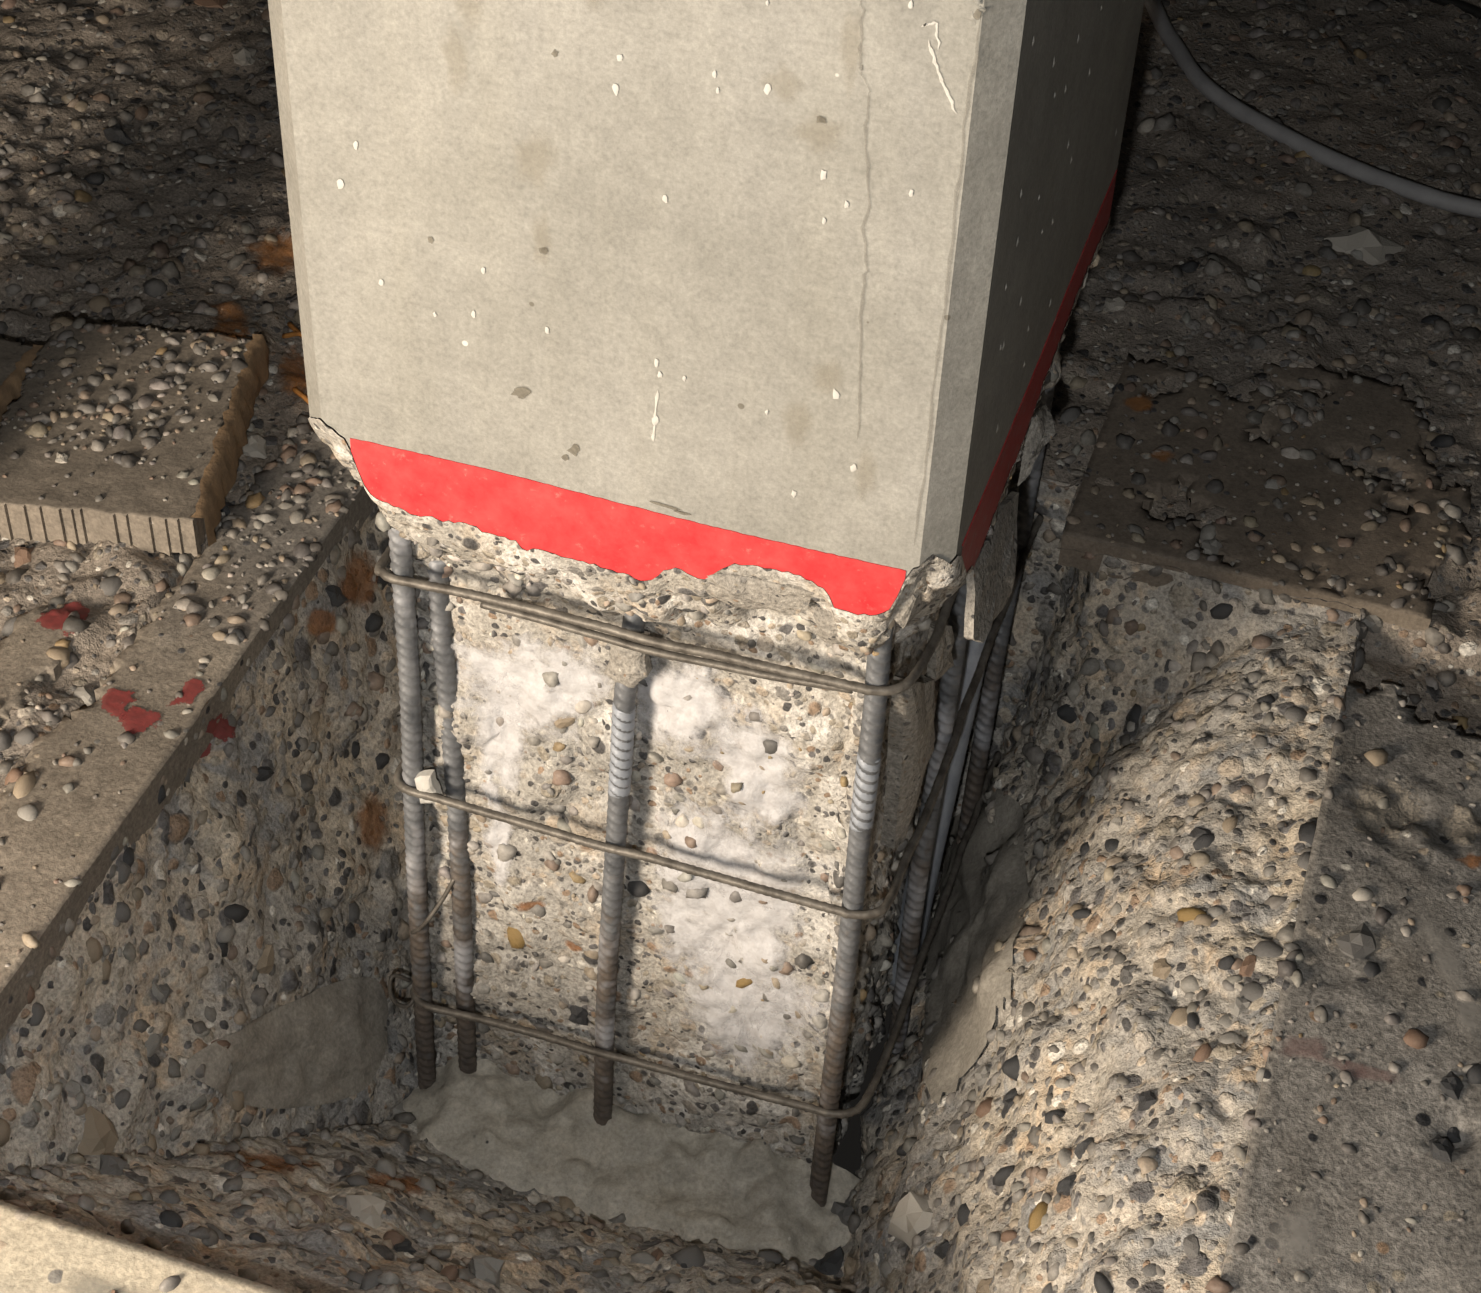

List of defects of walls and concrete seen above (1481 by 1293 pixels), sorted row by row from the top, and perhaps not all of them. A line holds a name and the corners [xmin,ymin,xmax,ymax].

leakage [454,635,608,883]
spalling [0,219,1360,1293]
leakage [636,665,827,1068]